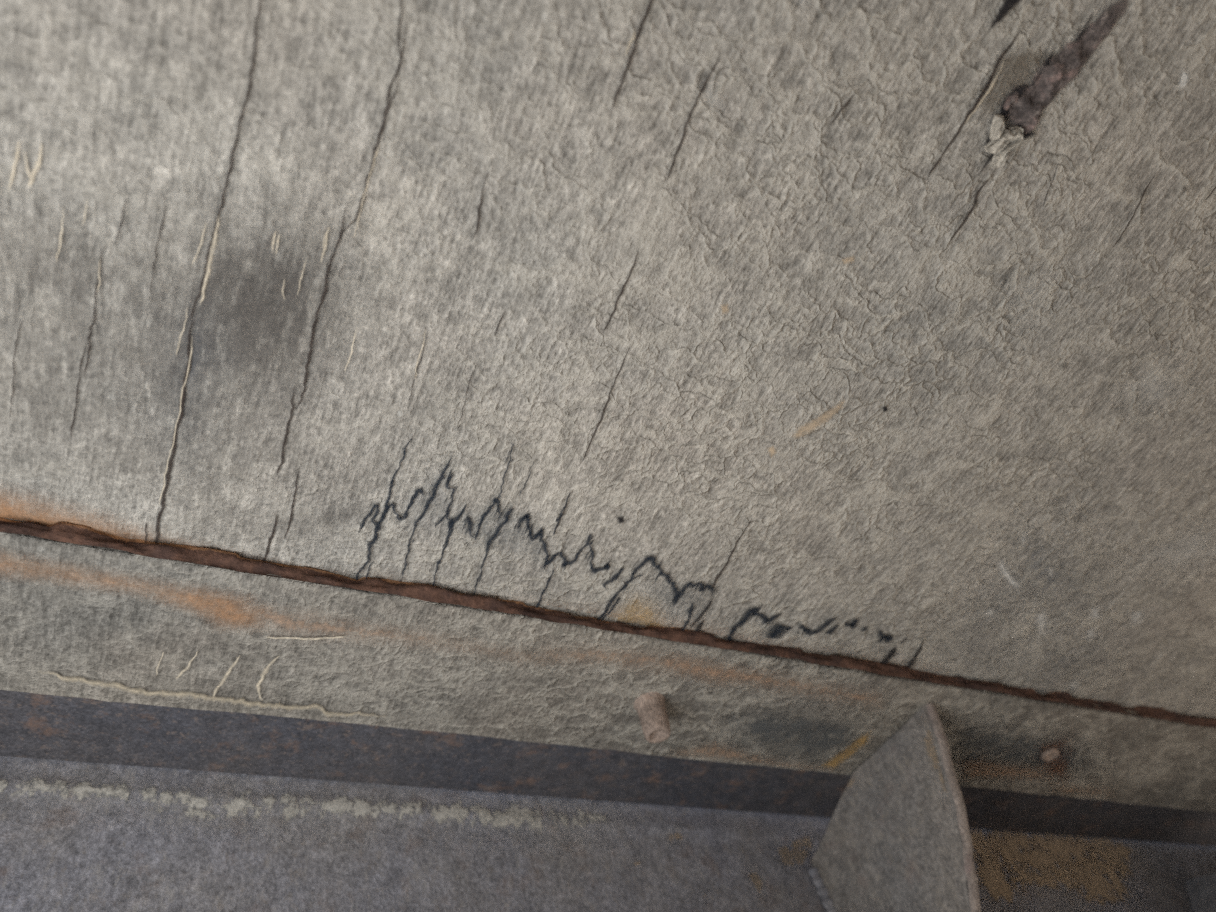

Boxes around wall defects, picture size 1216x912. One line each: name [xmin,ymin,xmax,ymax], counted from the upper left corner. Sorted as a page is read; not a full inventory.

spalling [980,0,1127,172]
crack [145,0,261,544]
crack [256,0,407,562]
crack [409,336,427,399]
crack [583,348,630,460]
crack [603,252,638,332]
rust [0,506,1216,728]
crack [356,372,924,668]